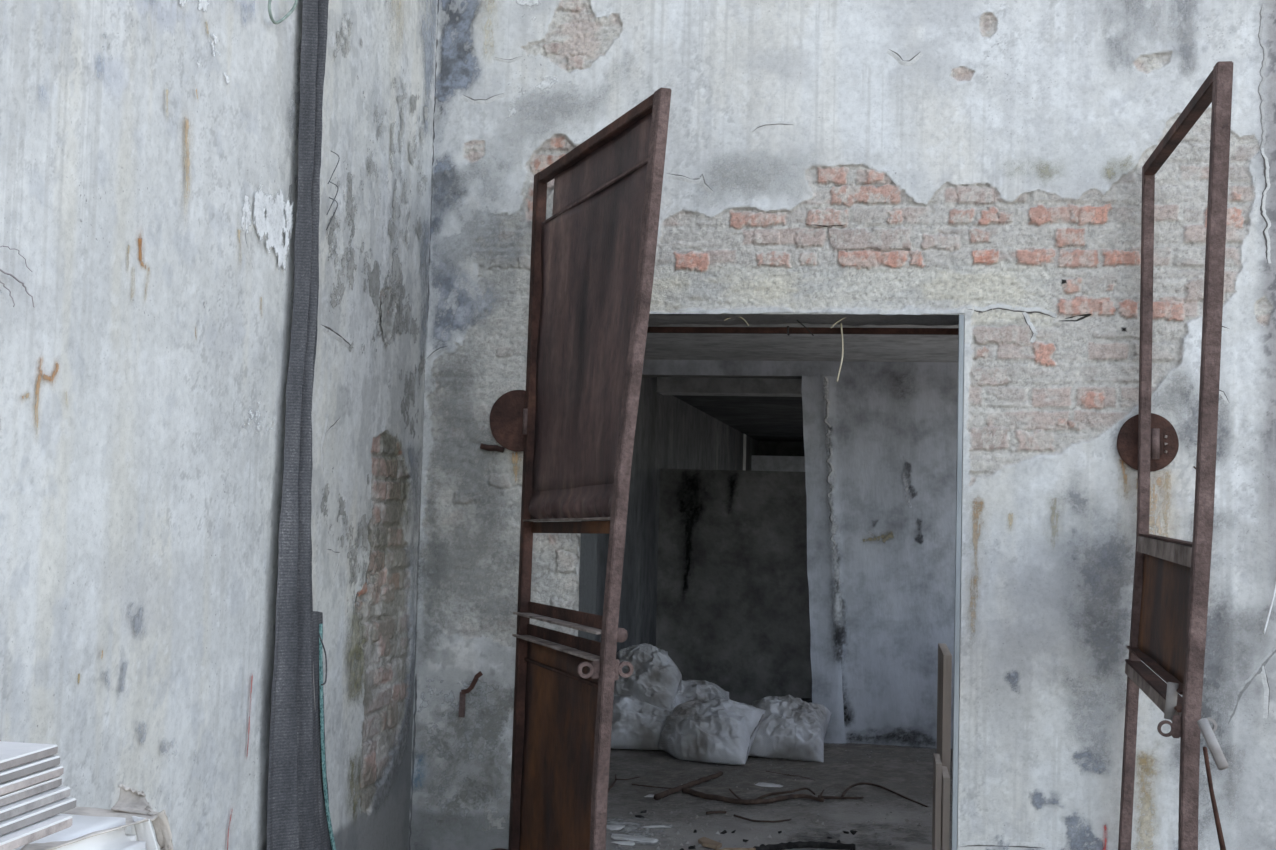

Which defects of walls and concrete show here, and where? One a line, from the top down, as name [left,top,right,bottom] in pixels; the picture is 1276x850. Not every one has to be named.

damp [422,0,480,128]
spalling [507,0,623,120]
crack [1258,4,1271,263]
flaking render [241,182,294,270]
flaking render [1223,129,1261,306]
flaking render [650,108,1212,487]
corrosion [22,358,59,427]
flaking render [321,77,581,817]
damp [678,472,703,594]
crack [1226,645,1276,725]